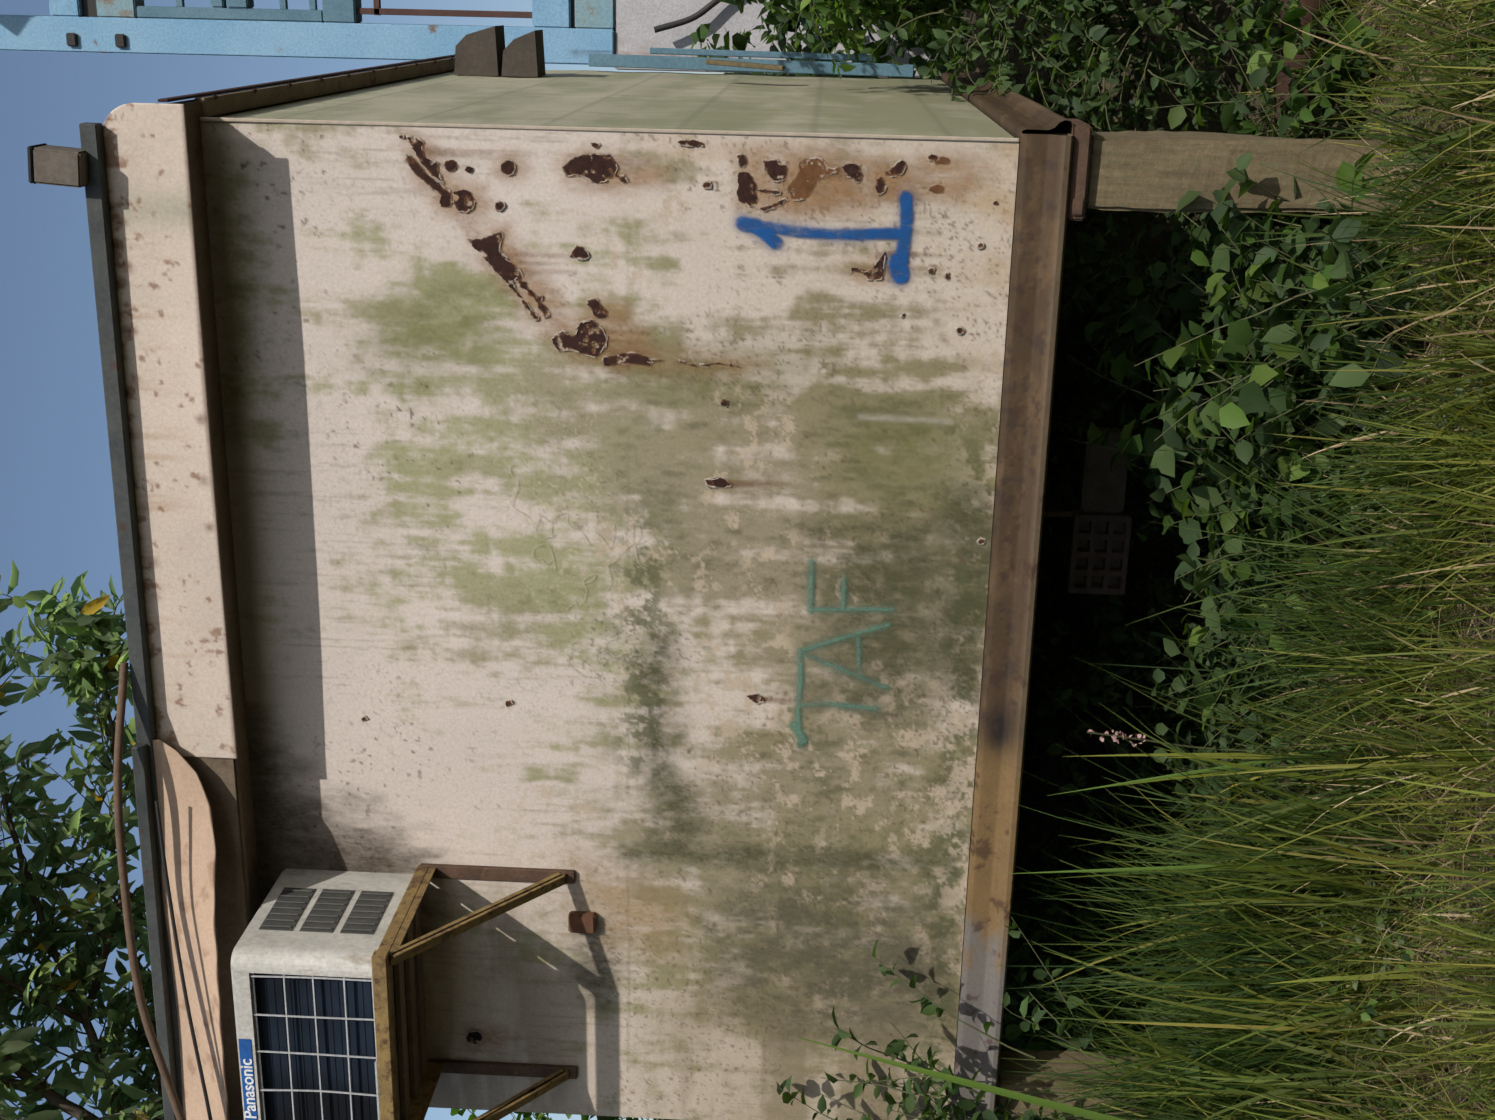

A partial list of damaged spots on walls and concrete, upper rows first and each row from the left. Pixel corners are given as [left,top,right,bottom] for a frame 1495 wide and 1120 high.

peeling [399,133,477,214]
spalling [562,152,652,184]
spalling [736,153,791,212]
peeling [466,231,641,358]
spalling [850,252,886,281]
leakage [841,536,931,695]
leakage [735,910,930,1014]